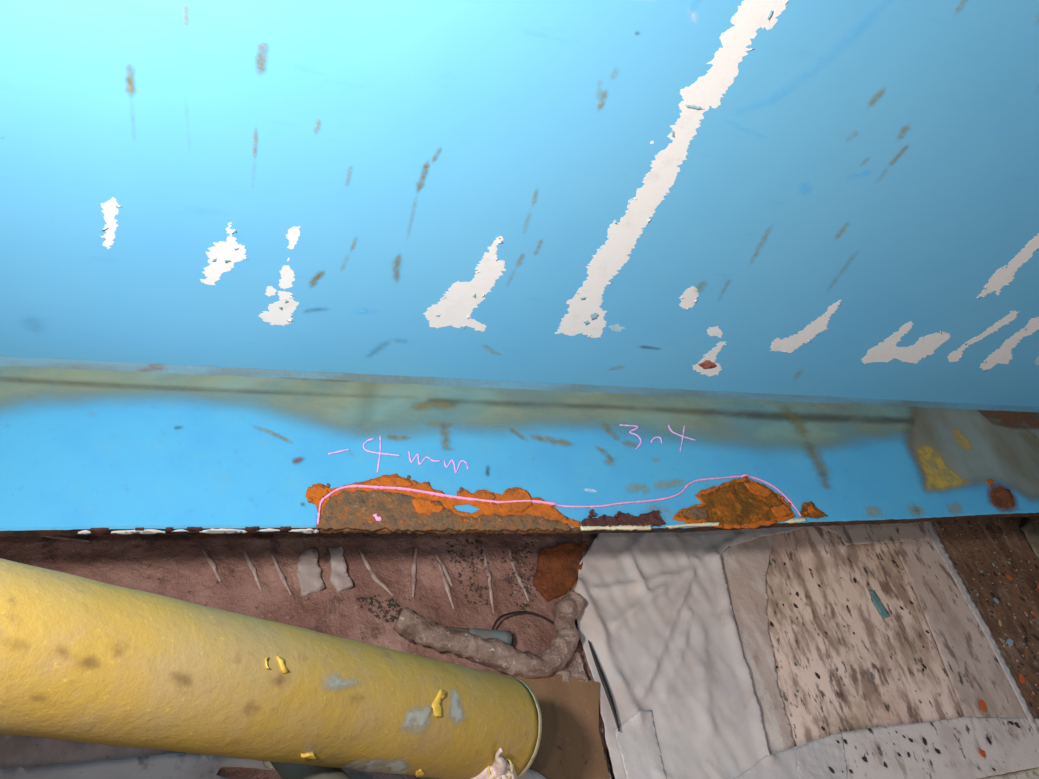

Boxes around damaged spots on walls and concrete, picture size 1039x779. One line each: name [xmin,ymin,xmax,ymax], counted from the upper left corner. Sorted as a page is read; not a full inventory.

peeling [555,0,789,338]
peeling [100,197,122,249]
peeling [200,222,247,285]
peeling [259,226,301,326]
peeling [423,236,506,332]
peeling [976,233,1039,299]
peeling [770,300,841,353]
peeling [861,311,1039,371]
damp [0,366,1039,499]
rust [306,473,828,535]
rust [986,479,1016,511]